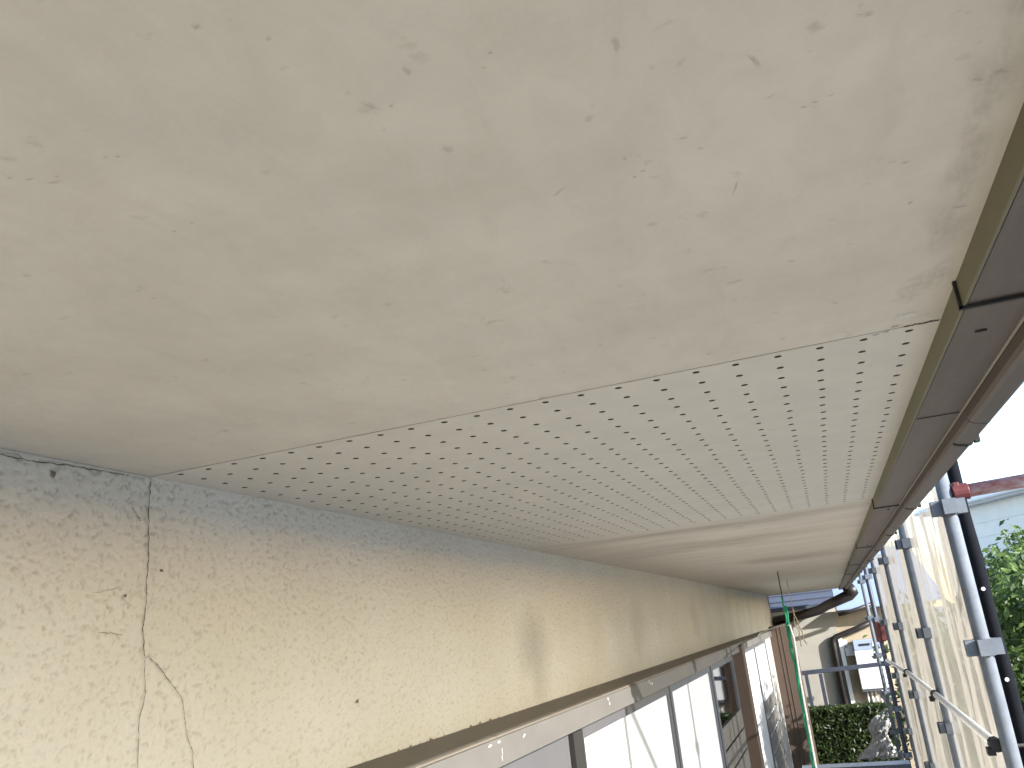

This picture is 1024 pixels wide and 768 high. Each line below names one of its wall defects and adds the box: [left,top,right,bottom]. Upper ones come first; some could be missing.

crack [98,482,194,768]